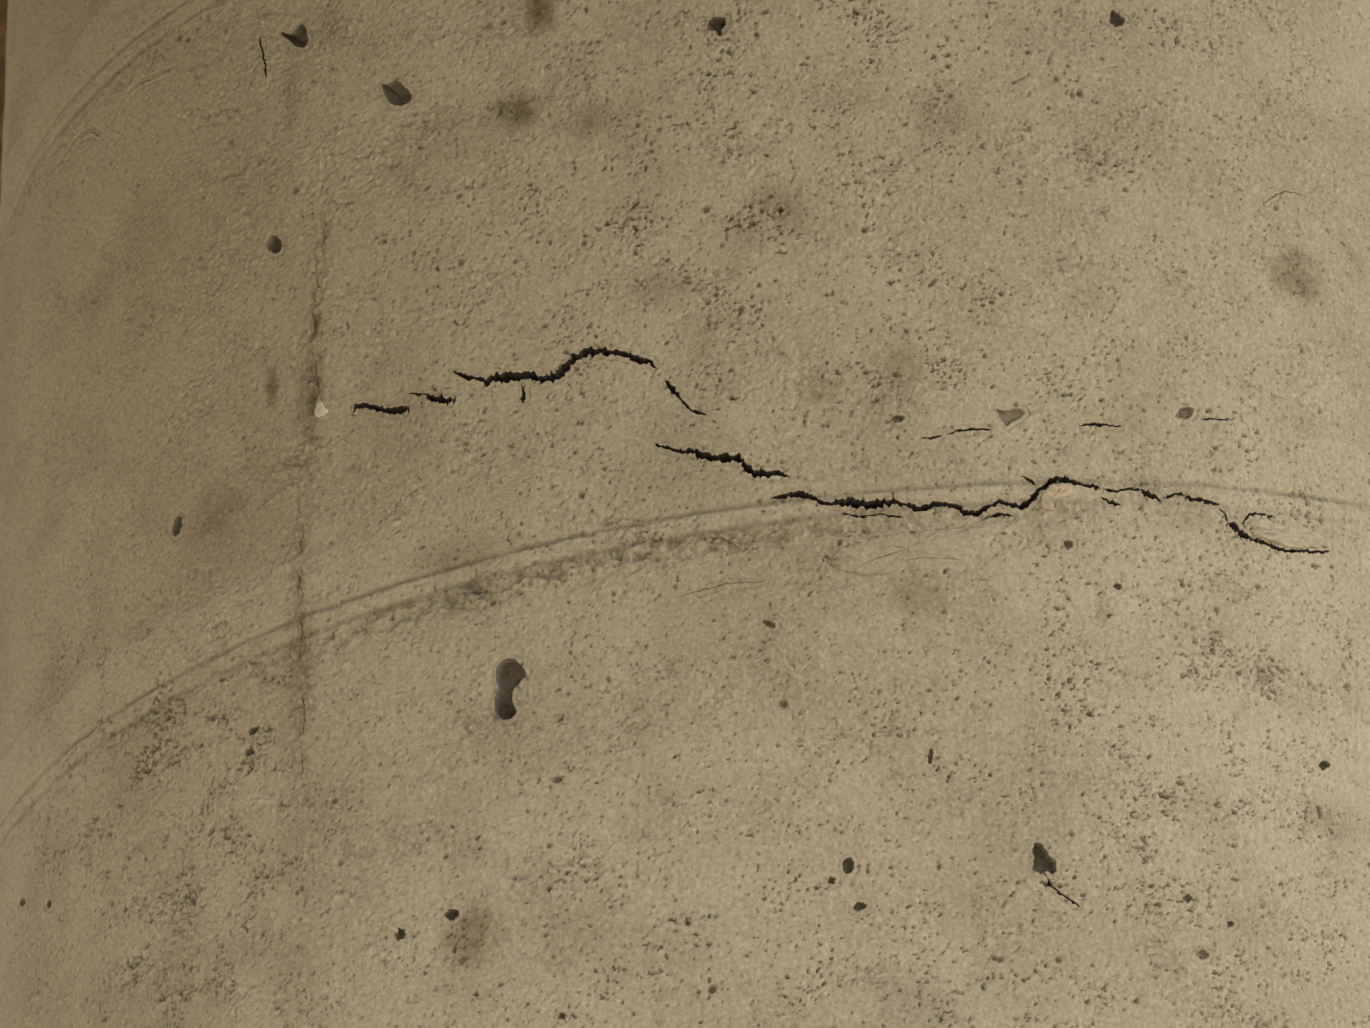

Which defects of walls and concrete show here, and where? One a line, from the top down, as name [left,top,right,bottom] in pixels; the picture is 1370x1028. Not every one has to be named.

crack [319,210,329,241]
crack [1261,186,1304,206]
crack [309,274,322,395]
crack [350,343,1330,558]
crack [293,530,307,655]
crack [681,532,763,599]
crack [297,692,310,779]